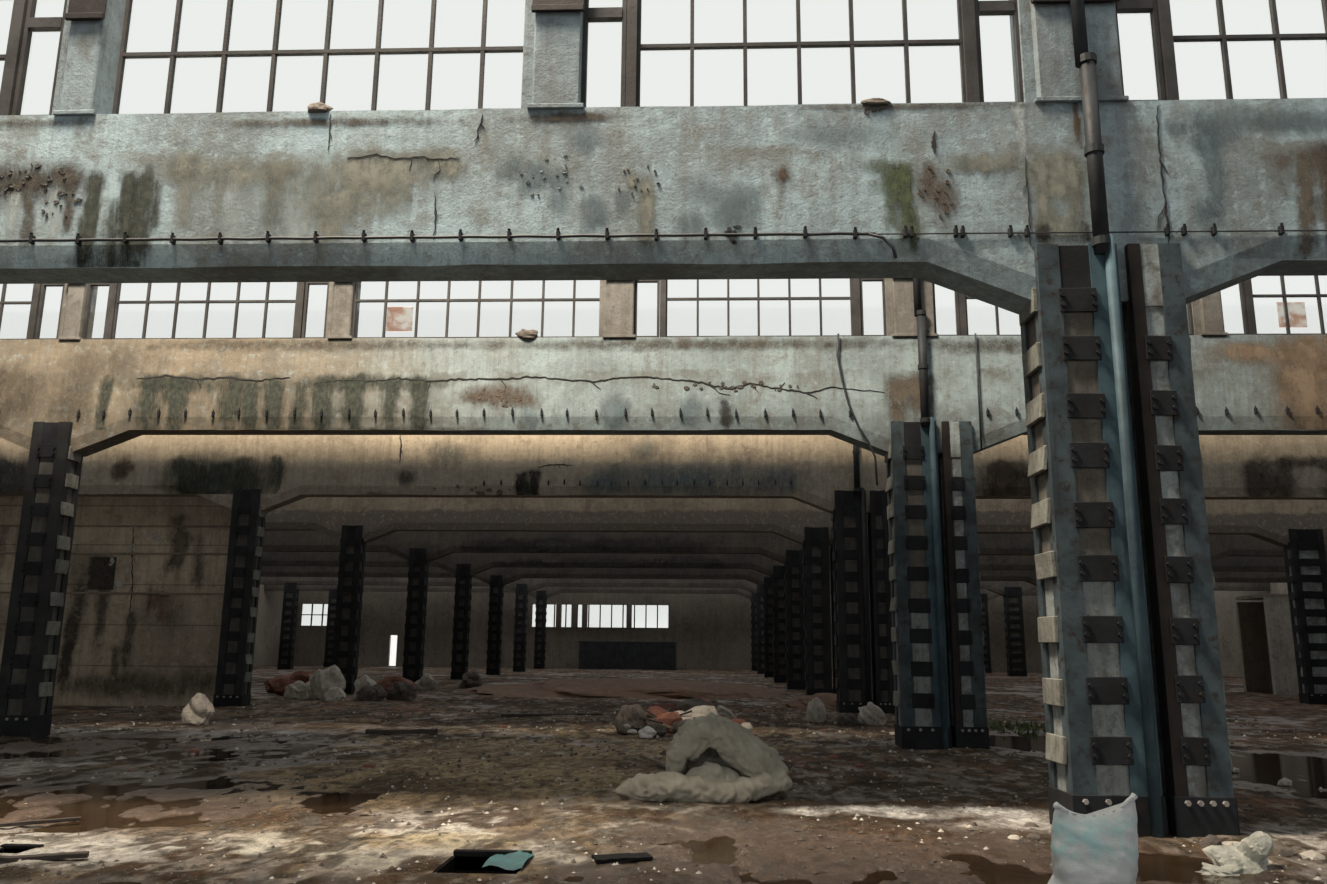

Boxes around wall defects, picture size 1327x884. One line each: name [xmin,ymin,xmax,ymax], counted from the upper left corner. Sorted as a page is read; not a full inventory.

leakage [868,160,919,250]
crack [1156,106,1170,243]
leakage [1168,113,1325,223]
leakage [1279,148,1327,259]
leakage [137,373,428,430]
crack [137,374,884,399]
leakage [171,456,284,494]
leakage [1244,456,1327,497]